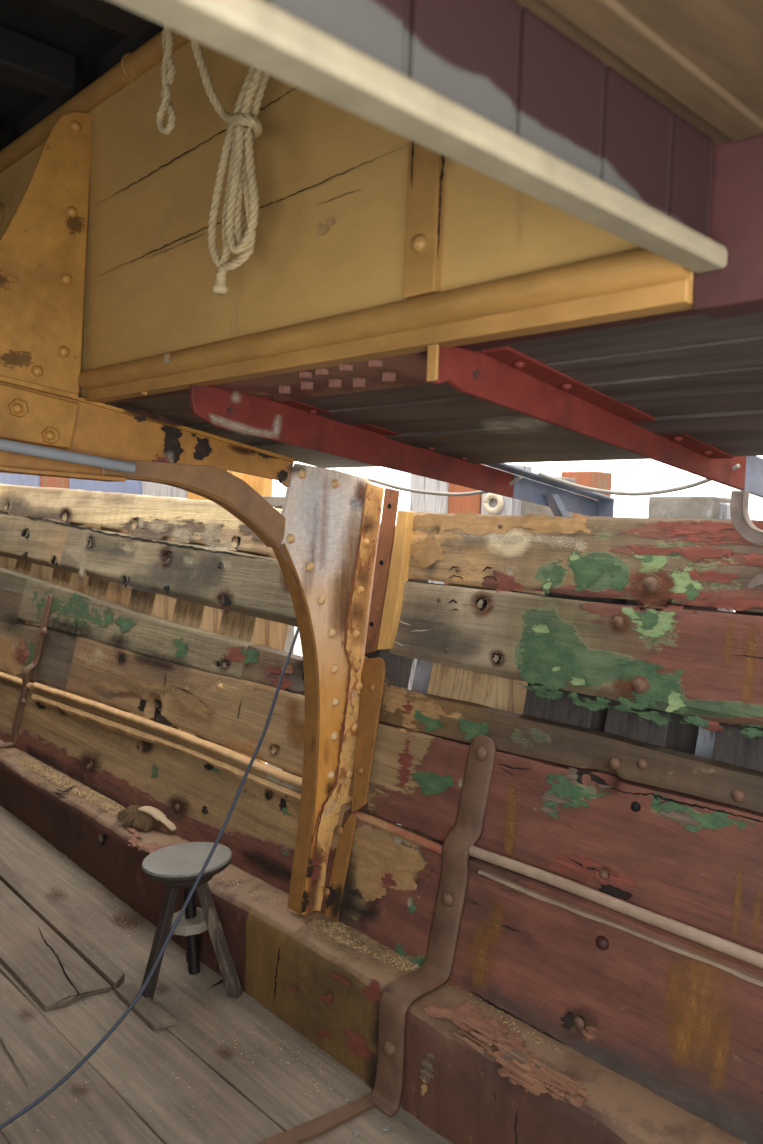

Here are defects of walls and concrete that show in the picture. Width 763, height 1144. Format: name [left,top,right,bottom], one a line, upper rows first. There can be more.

crack [90,129,227,208]
crack [92,141,414,278]
crack [437,154,445,257]
peeling [410,510,591,569]
peeling [495,574,524,592]
peeling [541,520,763,641]
peeling [516,620,763,739]
peeling [539,773,610,819]
peeling [649,791,754,832]
peeling [350,820,428,914]
crack [39,928,100,1005]
peeling [419,1053,435,1096]